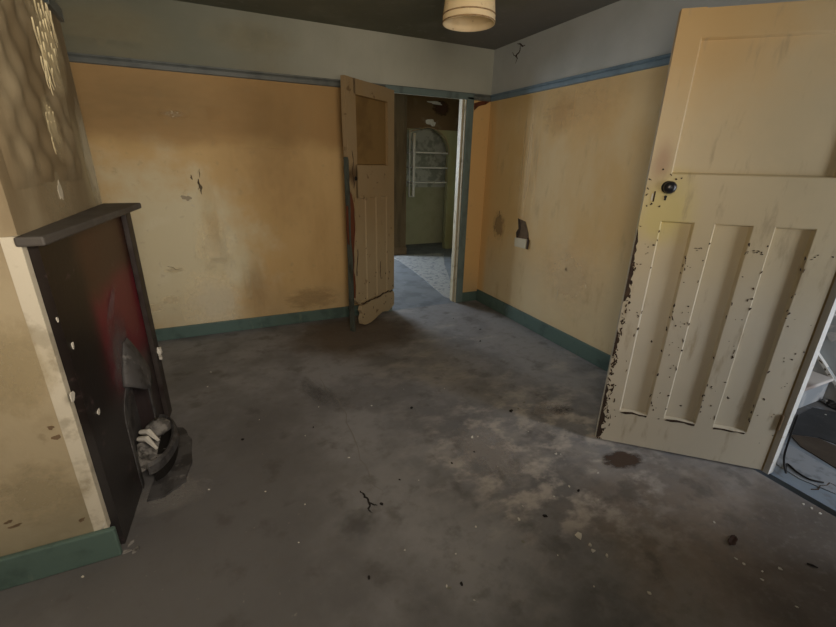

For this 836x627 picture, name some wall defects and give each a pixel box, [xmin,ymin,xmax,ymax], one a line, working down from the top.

spalling [516,218,529,239]
water stain [603,451,641,468]
crack [360,491,377,513]